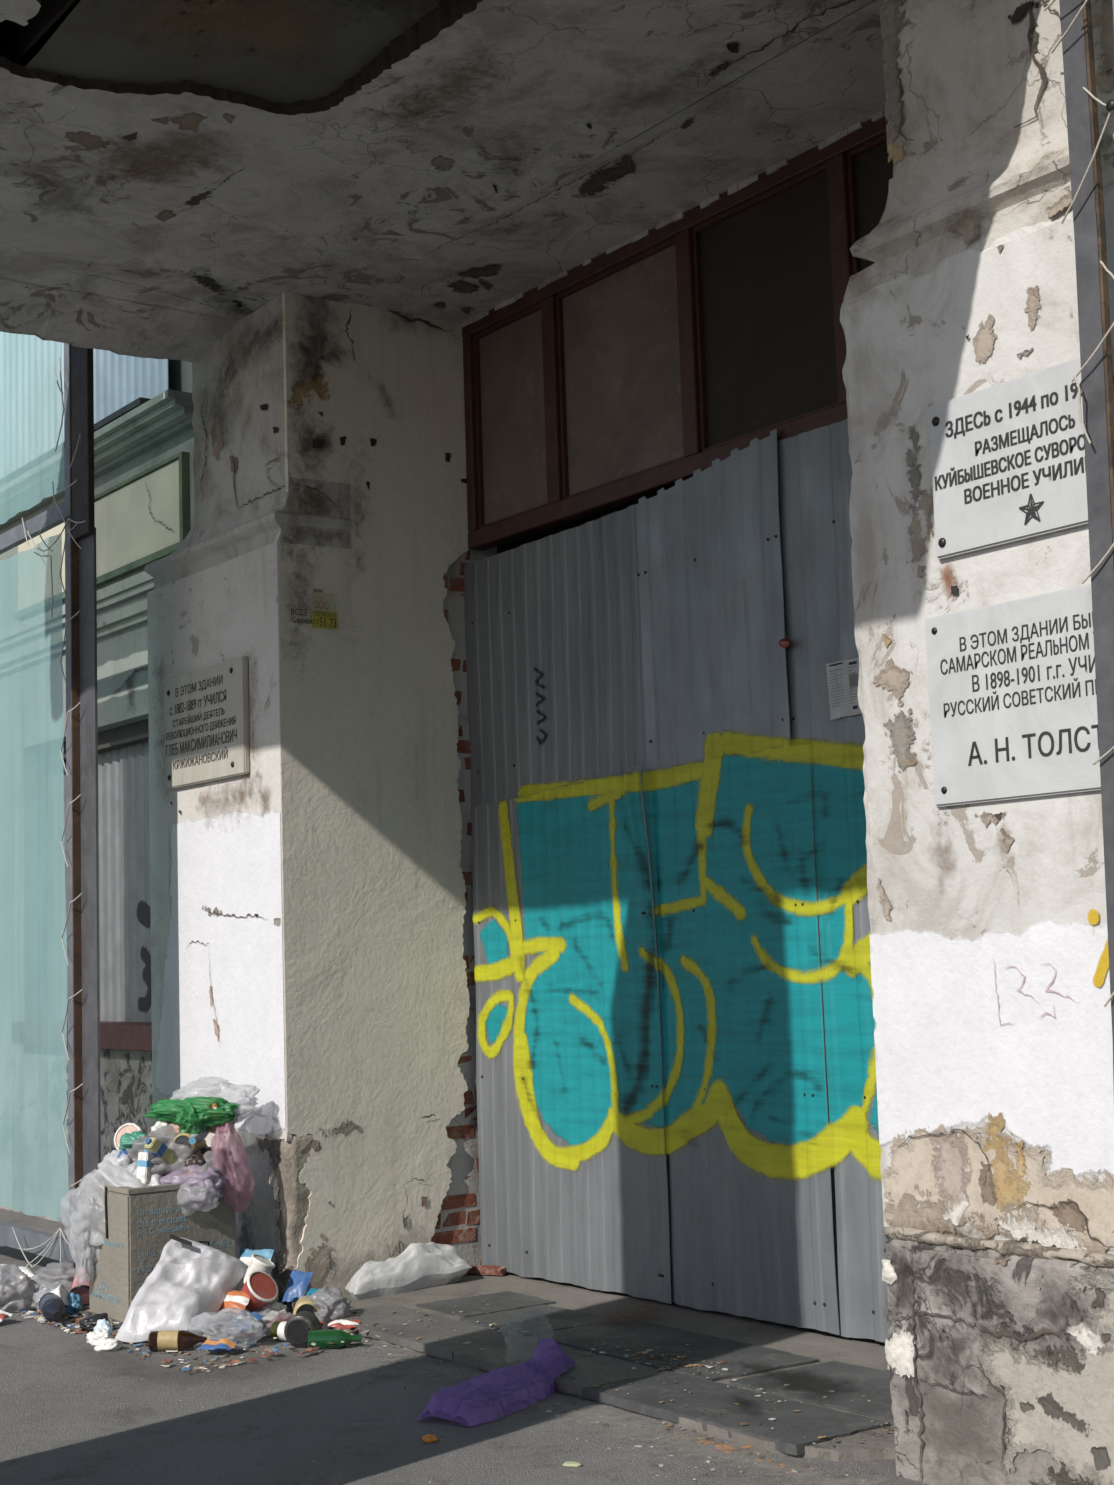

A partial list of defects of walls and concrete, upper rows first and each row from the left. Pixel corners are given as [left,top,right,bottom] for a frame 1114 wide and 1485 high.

crack [1008,0,1061,128]
peeling [966,314,997,364]
peeling [1017,285,1041,359]
peeling [870,634,916,772]
flaking render [463,956,476,995]
flaking render [446,1090,477,1139]
spalling [240,1145,281,1273]
flaking render [431,1158,480,1244]
peeling [304,1234,335,1292]
water stain [891,1253,919,1309]
spalling [454,1301,802,1432]
water stain [923,1333,964,1378]